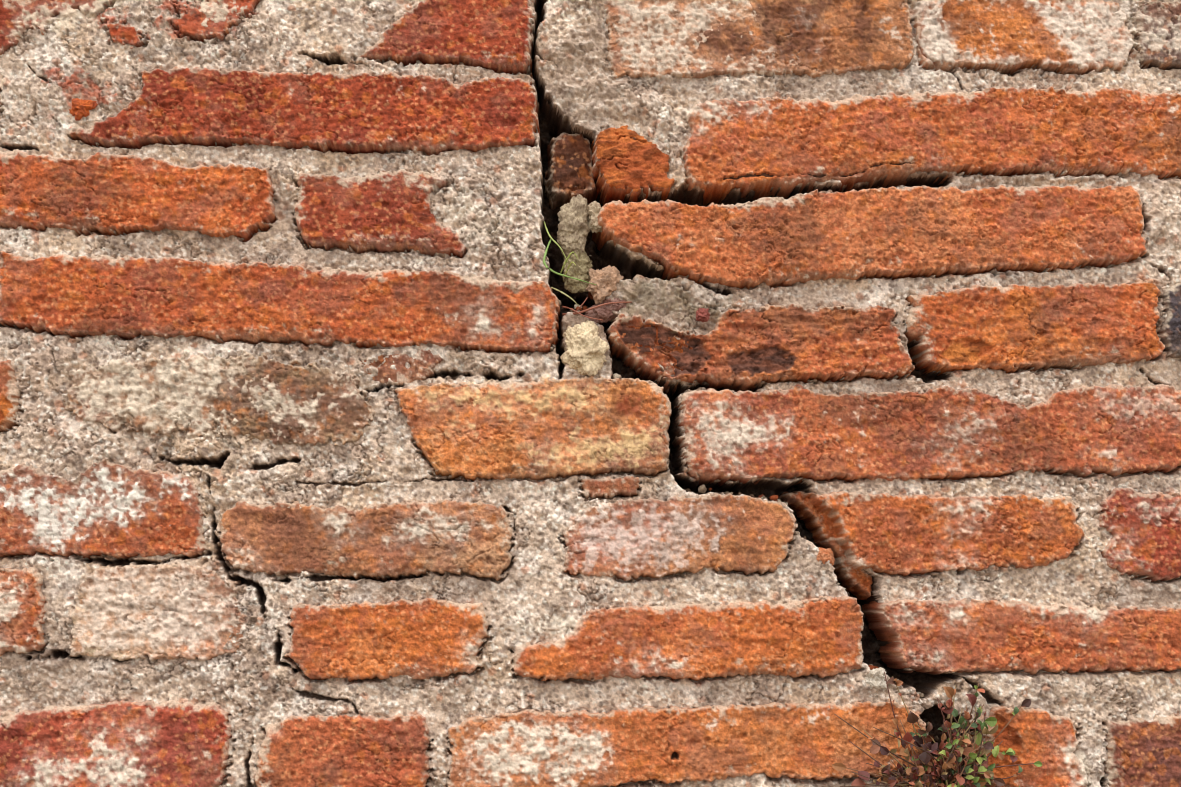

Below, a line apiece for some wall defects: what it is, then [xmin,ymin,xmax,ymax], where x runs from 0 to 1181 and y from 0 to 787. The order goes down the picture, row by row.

crack [298,50,435,67]
crack [951,65,1026,90]
crack [366,0,953,547]
crack [81,450,474,715]
crack [837,569,1003,757]
crack [243,737,254,787]